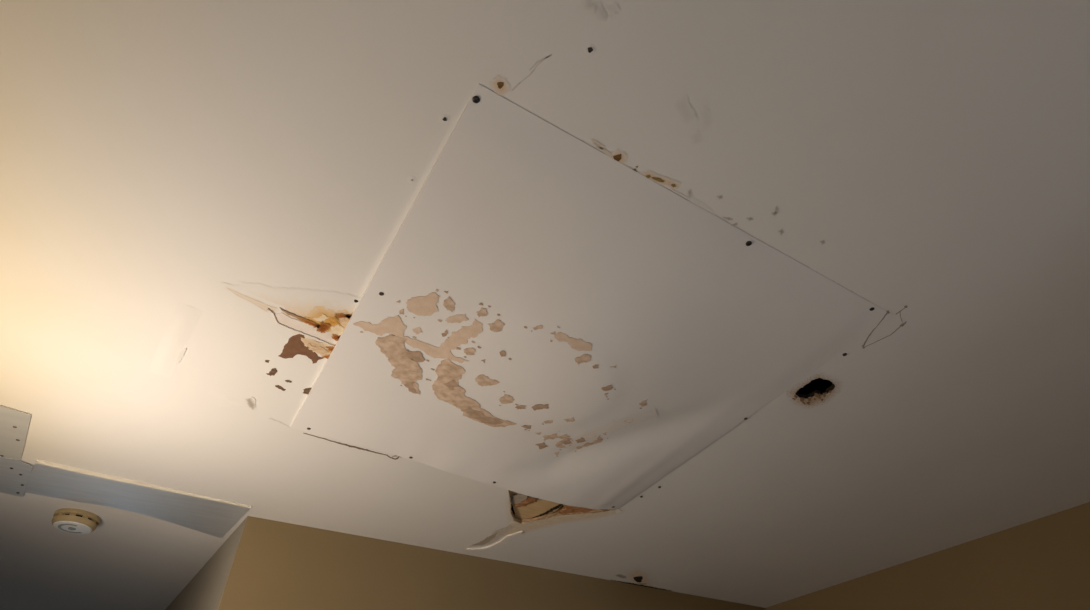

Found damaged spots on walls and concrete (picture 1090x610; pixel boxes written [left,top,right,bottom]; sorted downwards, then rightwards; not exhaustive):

rust [489,75,510,98]
rust [590,139,681,189]
rust [297,314,352,359]
peeling [265,289,608,457]
hole [783,371,845,410]
spalling [506,490,622,535]